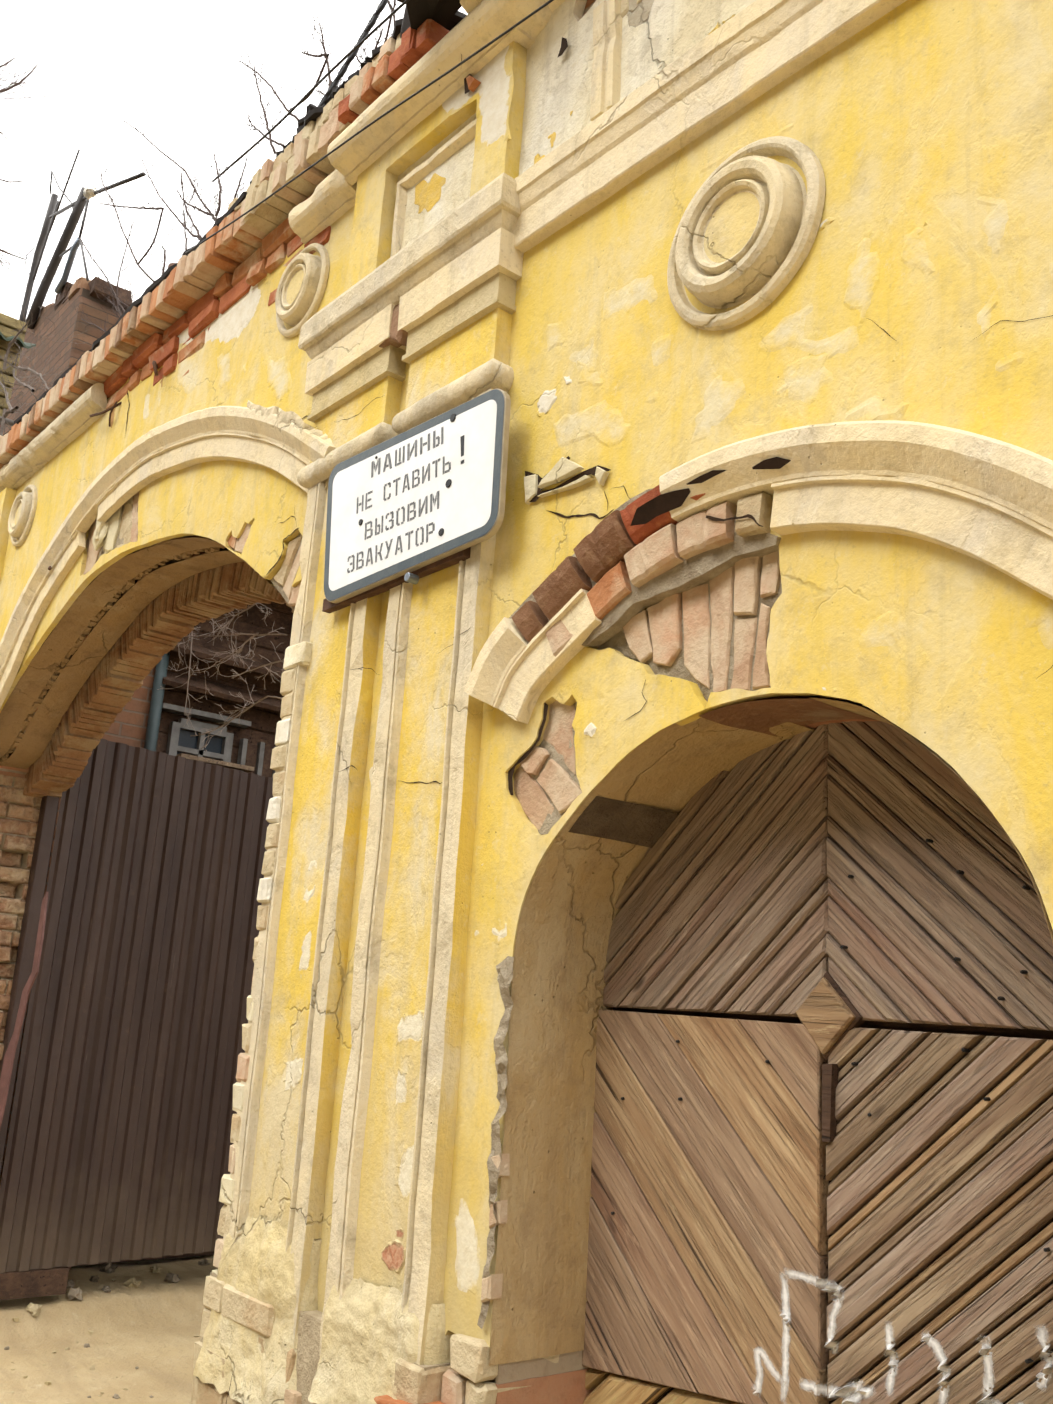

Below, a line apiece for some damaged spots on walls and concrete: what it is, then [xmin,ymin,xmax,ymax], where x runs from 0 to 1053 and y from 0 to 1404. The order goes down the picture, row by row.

flaking render [627,0,654,27]
peeling [603,274,658,321]
peeling [524,320,632,505]
spalling [597,550,782,701]
spalling [508,701,597,835]
spalling [453,923,514,1329]
spalling [381,1228,406,1273]